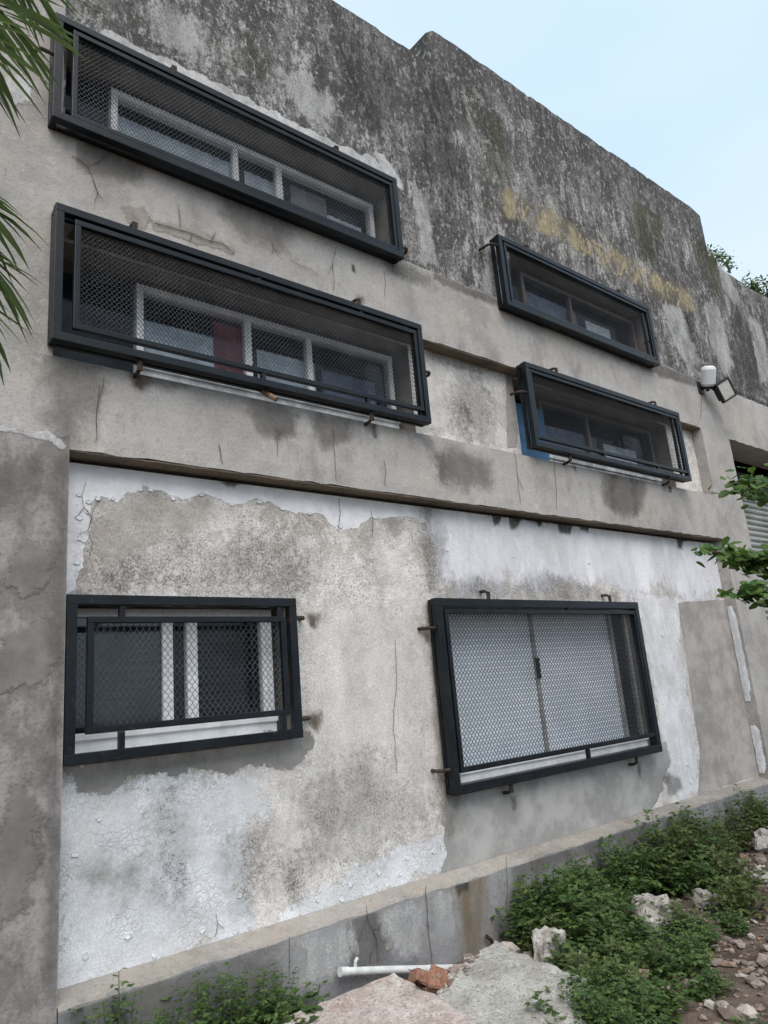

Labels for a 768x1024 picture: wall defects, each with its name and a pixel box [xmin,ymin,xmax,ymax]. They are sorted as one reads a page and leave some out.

crack [72,153,109,204]
crack [155,212,234,254]
damp [621,286,696,381]
damp [704,246,768,388]
crack [95,382,104,443]
peeling [66,462,751,800]
crack [391,642,399,770]
peeling [0,592,447,989]
damp [433,882,468,927]